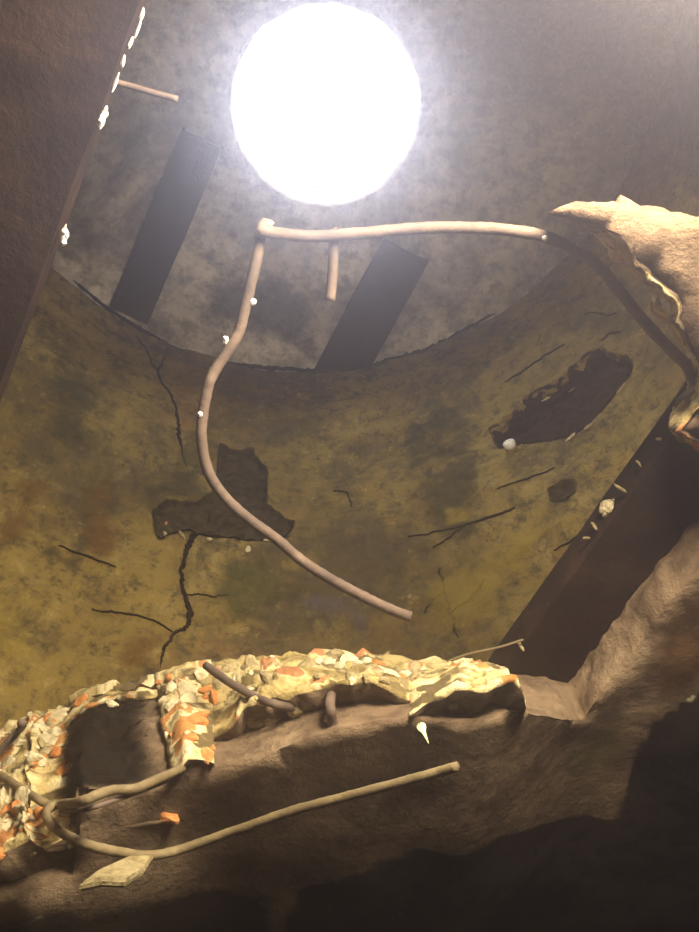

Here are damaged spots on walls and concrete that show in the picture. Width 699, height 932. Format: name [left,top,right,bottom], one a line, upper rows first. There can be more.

spalling [616,194,643,211]
spalling [153,218,699,622]
crack [505,344,565,382]
crack [59,545,116,568]
crack [91,513,229,668]
crack [408,466,555,639]
spalling [0,648,526,891]